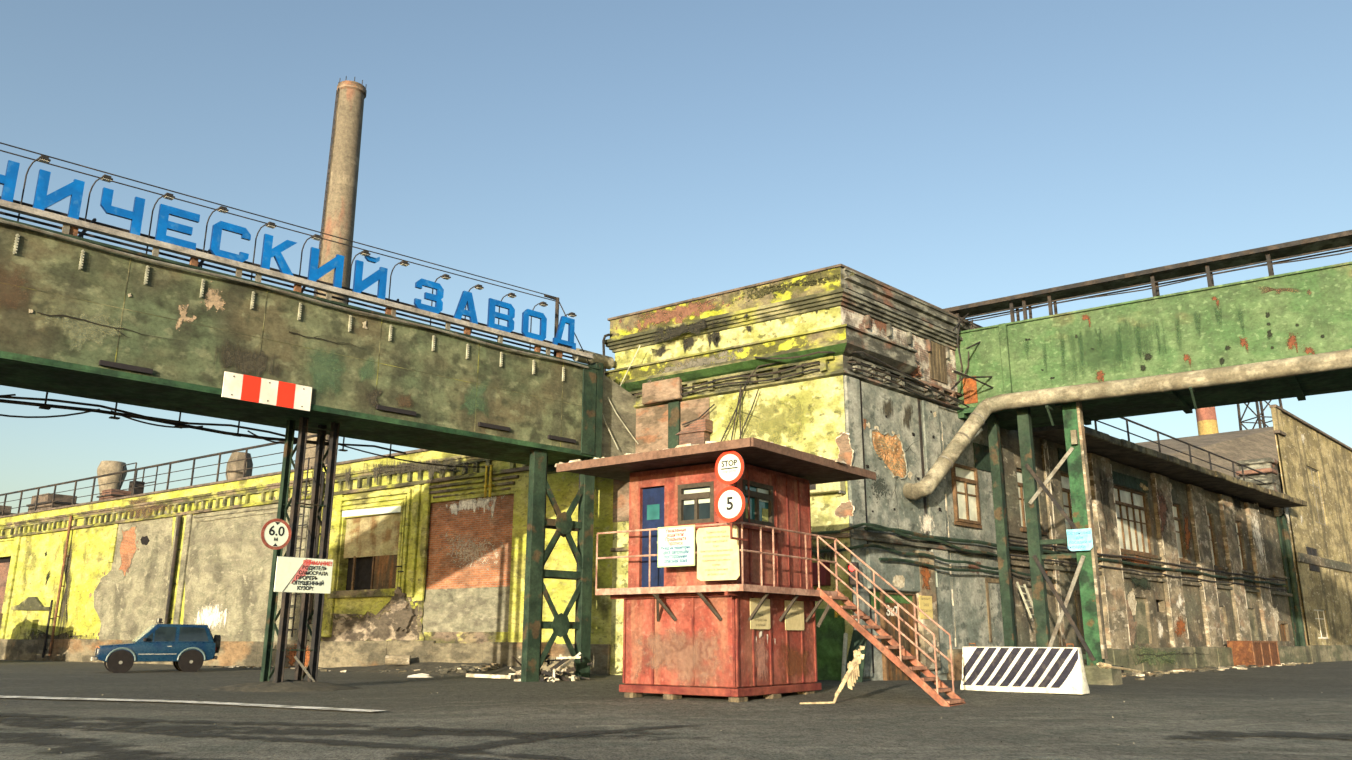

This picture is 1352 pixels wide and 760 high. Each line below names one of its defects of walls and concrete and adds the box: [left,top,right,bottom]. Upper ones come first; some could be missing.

rust [1264,287,1312,295]
damp [215,341,279,377]
damp [652,332,721,357]
rust [1287,333,1315,354]
flaking render [835,415,920,481]
peeling [89,498,173,640]
peeling [183,493,424,642]
spalling [441,527,504,571]